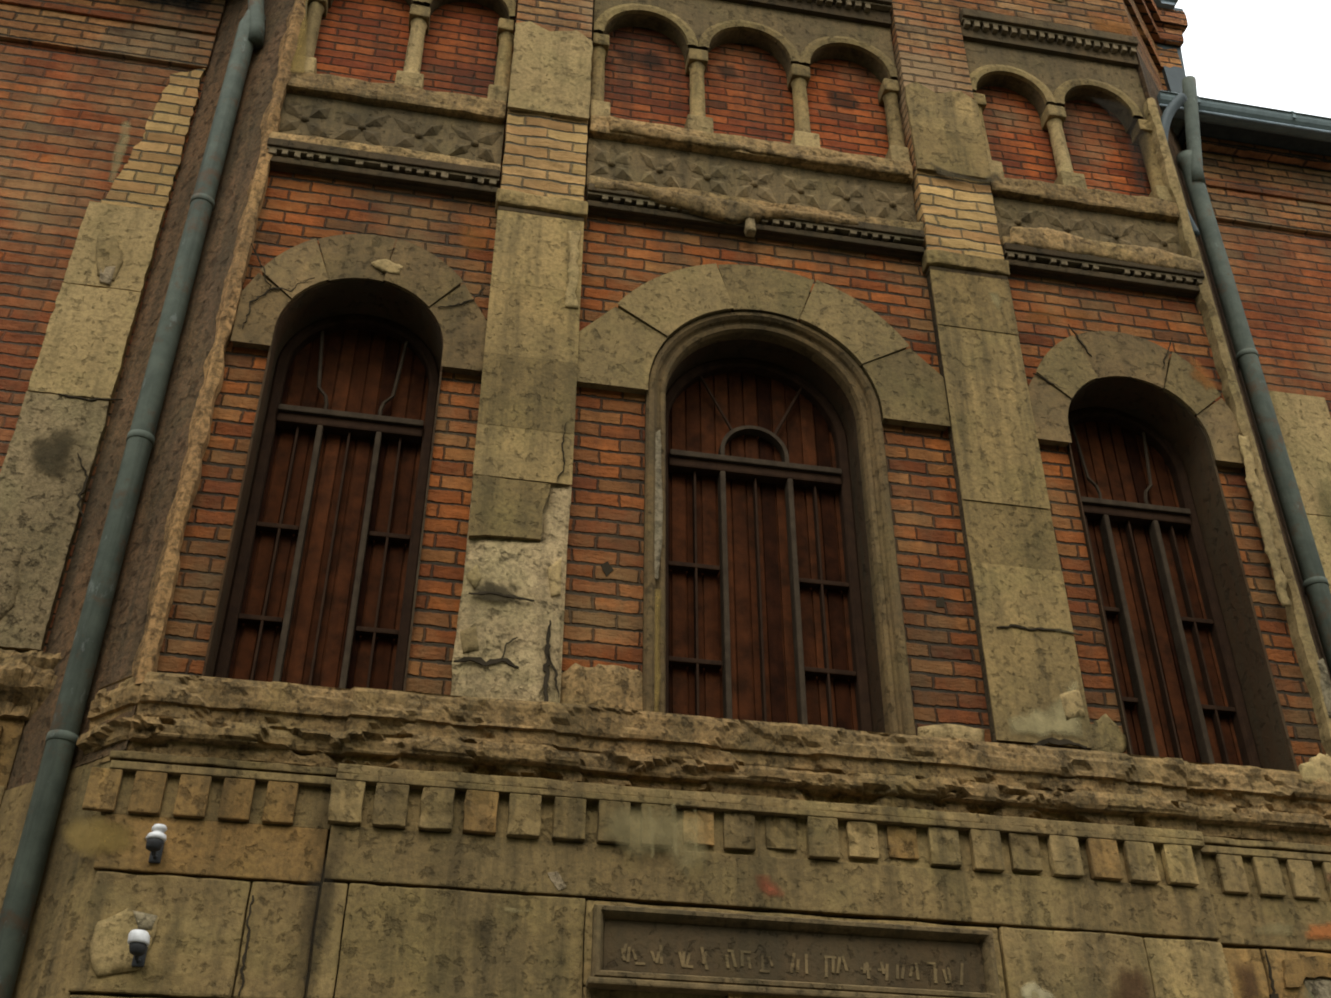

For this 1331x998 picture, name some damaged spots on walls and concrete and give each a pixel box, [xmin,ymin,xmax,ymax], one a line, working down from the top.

crack [453,620,559,702]
peeling [1011,684,1127,753]
spalling [1308,923,1331,939]